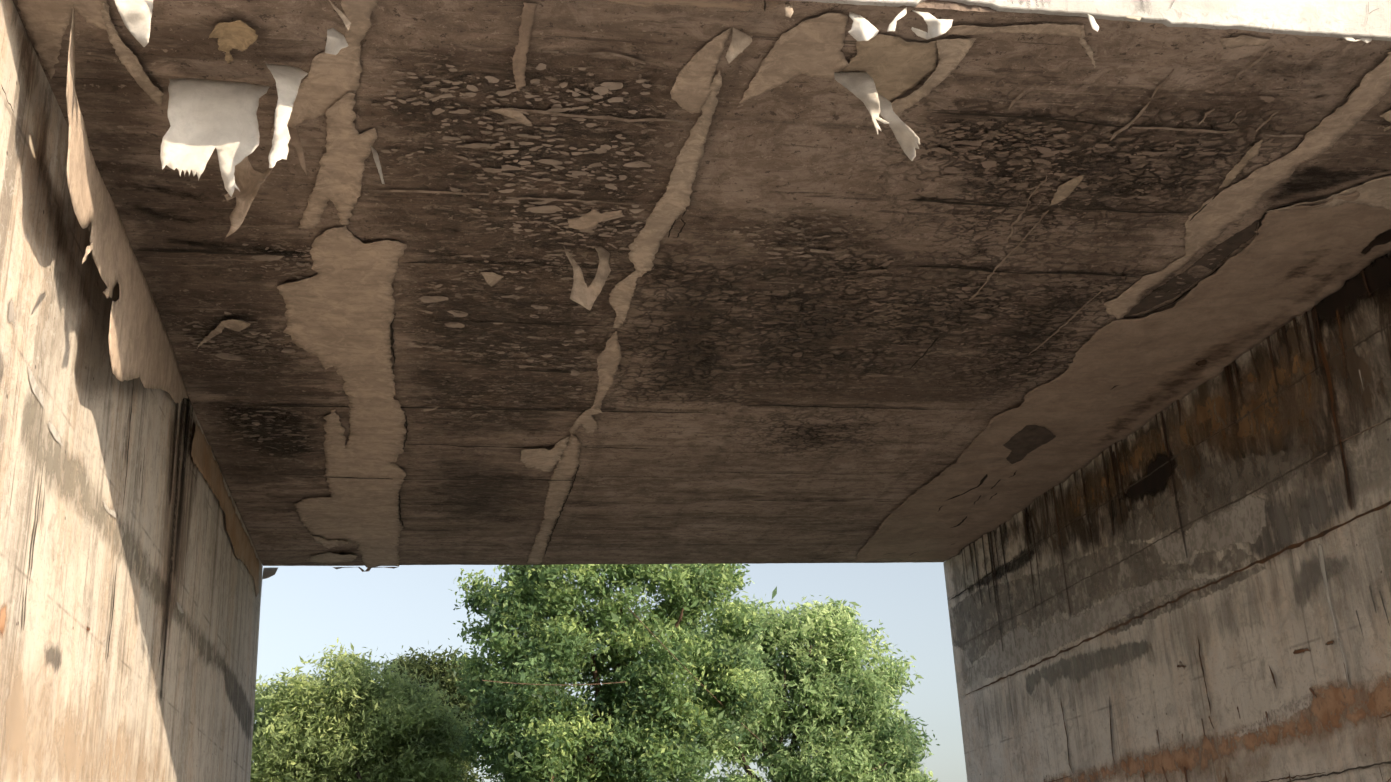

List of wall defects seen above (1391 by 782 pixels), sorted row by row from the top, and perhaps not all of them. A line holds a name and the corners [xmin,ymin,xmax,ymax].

peeling [17,0,752,597]
peeling [605,0,1391,563]
leakage [22,401,252,739]
crack [1061,703,1073,773]
crack [1108,697,1116,763]
leakage [949,252,1391,694]
crack [1198,639,1211,714]
rust [1044,677,1391,782]